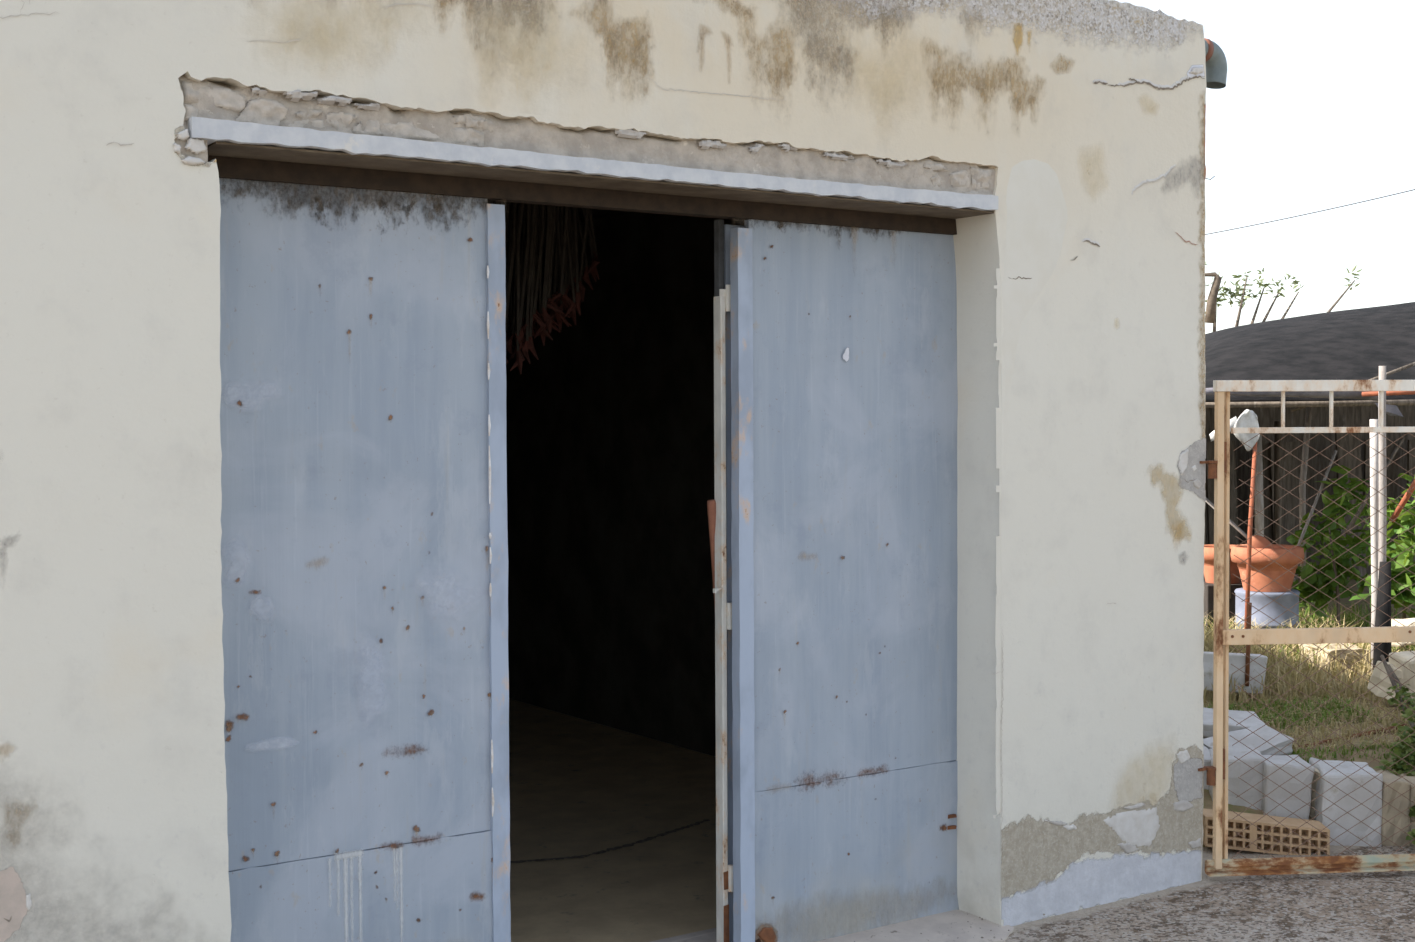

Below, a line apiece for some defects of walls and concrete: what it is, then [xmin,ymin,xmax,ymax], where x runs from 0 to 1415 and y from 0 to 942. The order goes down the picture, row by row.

water stain [928,49,1038,106]
crack [1093,75,1205,90]
spalling [173,75,997,195]
spalling [1177,438,1206,501]
rust [225,714,249,742]
peeling [1001,745,1204,926]
rust [755,924,778,942]